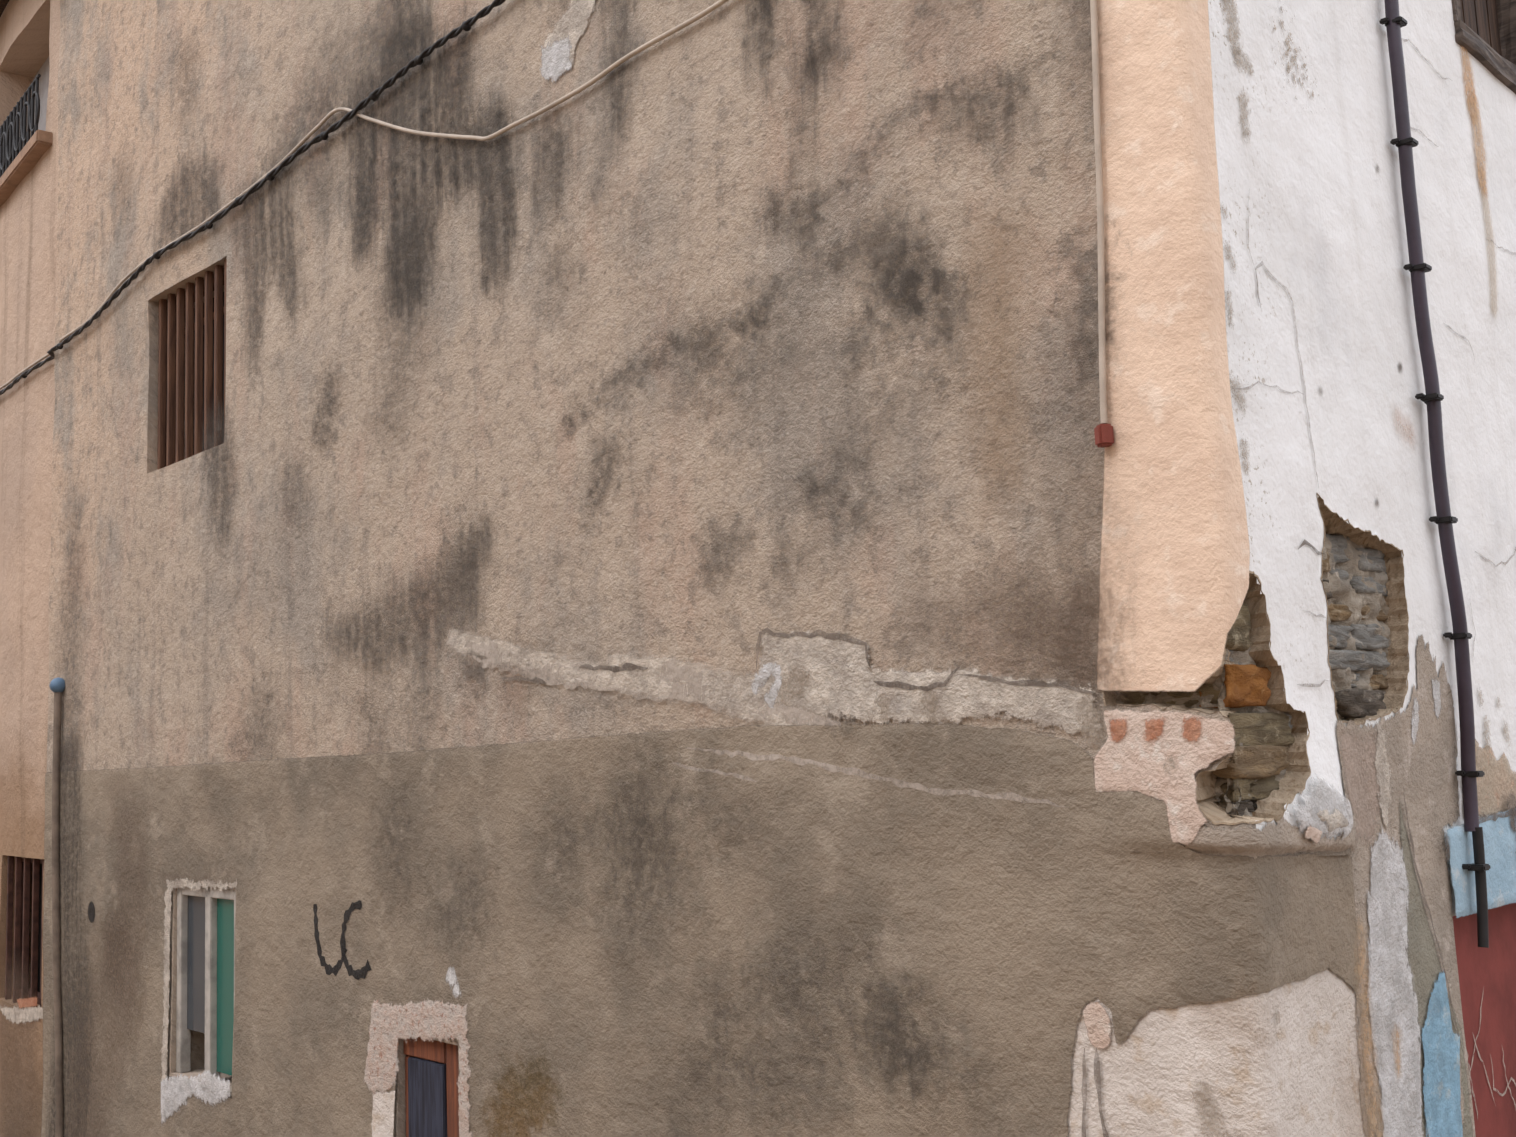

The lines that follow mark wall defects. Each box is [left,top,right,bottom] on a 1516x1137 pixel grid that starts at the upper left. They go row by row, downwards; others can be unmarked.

damp [243,165,295,349]
damp [348,12,516,313]
flaking render [540,0,595,83]
damp [606,29,625,130]
crack [1235,188,1317,475]
damp [346,537,819,726]
flaking render [748,493,1516,1137]
flaking render [364,967,473,1137]